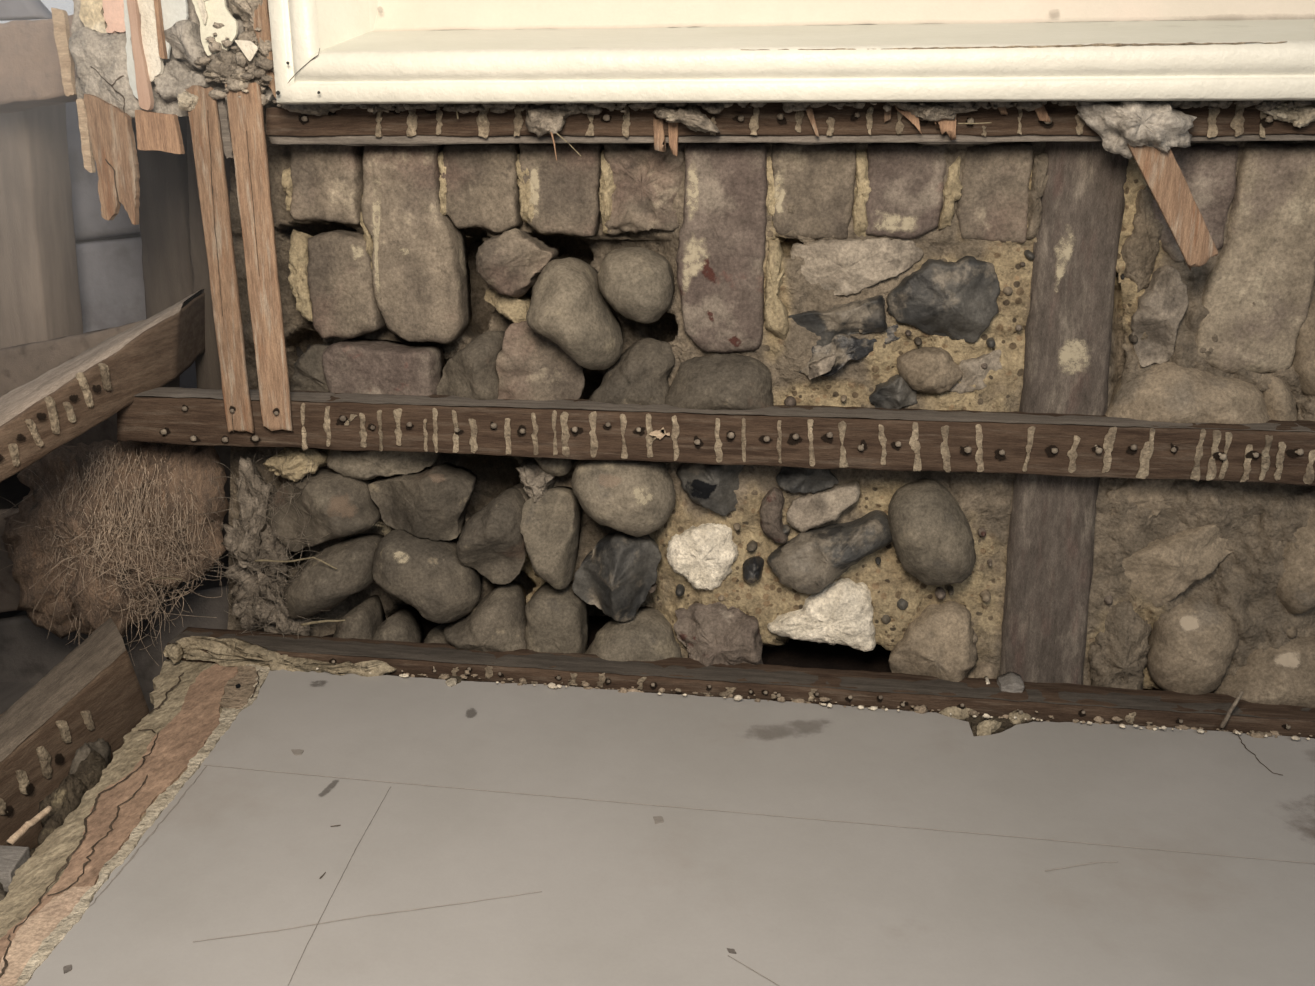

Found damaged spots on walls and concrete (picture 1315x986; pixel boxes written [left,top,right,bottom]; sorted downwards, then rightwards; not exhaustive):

peeling [79,0,126,33]
crack [0,672,1315,977]